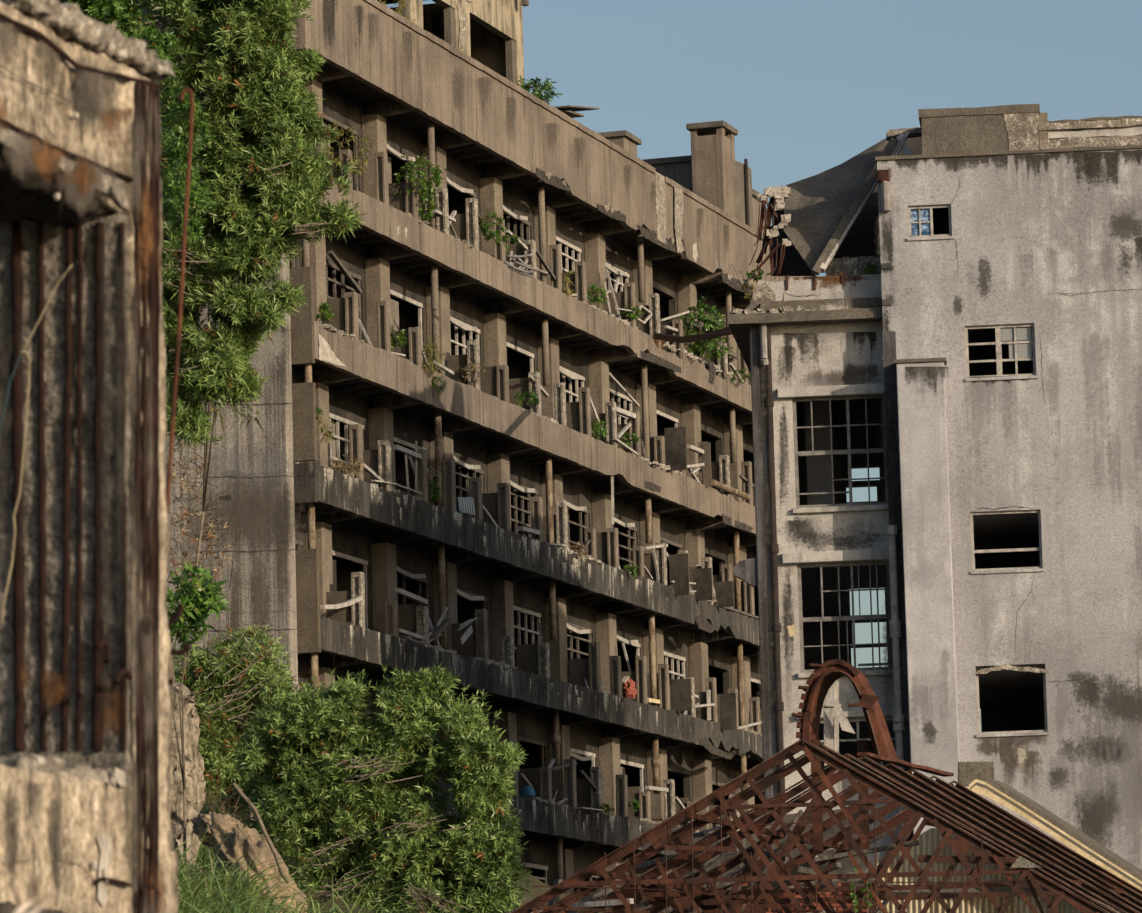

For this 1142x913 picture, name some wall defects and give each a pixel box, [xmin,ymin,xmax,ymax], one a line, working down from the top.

spalling [0,126,43,150]
spalling [96,170,130,211]
rust [77,69,160,274]
damp [883,222,894,272]
damp [1111,212,1142,266]
crack [1038,288,1142,296]
rust [0,312,25,639]
rust [93,255,158,742]
damp [756,333,903,745]
damp [1069,672,1142,722]
peeling [91,831,111,907]
spalling [0,900,64,913]